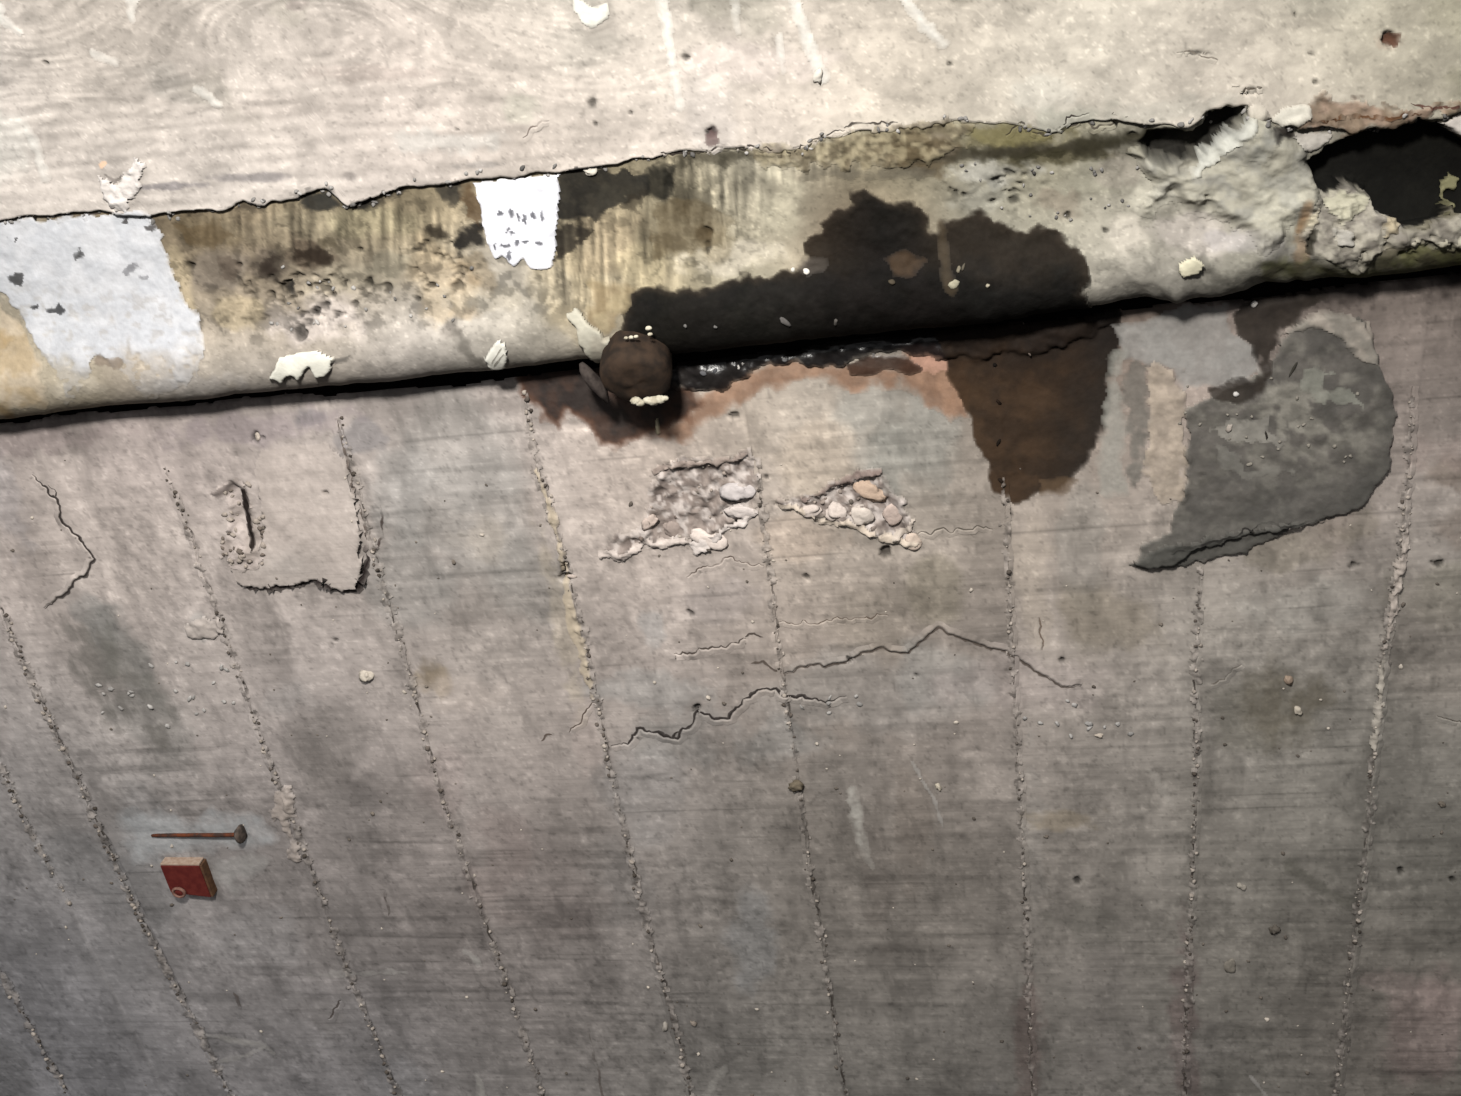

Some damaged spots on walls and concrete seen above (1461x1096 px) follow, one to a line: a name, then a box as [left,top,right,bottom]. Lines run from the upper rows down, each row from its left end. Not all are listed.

peeling [0,157,205,419]
damp [288,183,410,213]
damp [411,178,487,275]
damp [630,332,944,406]
rust [514,309,1123,506]
spalling [1069,86,1250,161]
damp [1092,177,1461,505]
spalling [1272,89,1461,227]
crack [29,474,96,609]
peeling [210,420,384,593]
spalling [598,446,925,562]
crack [541,613,1085,751]